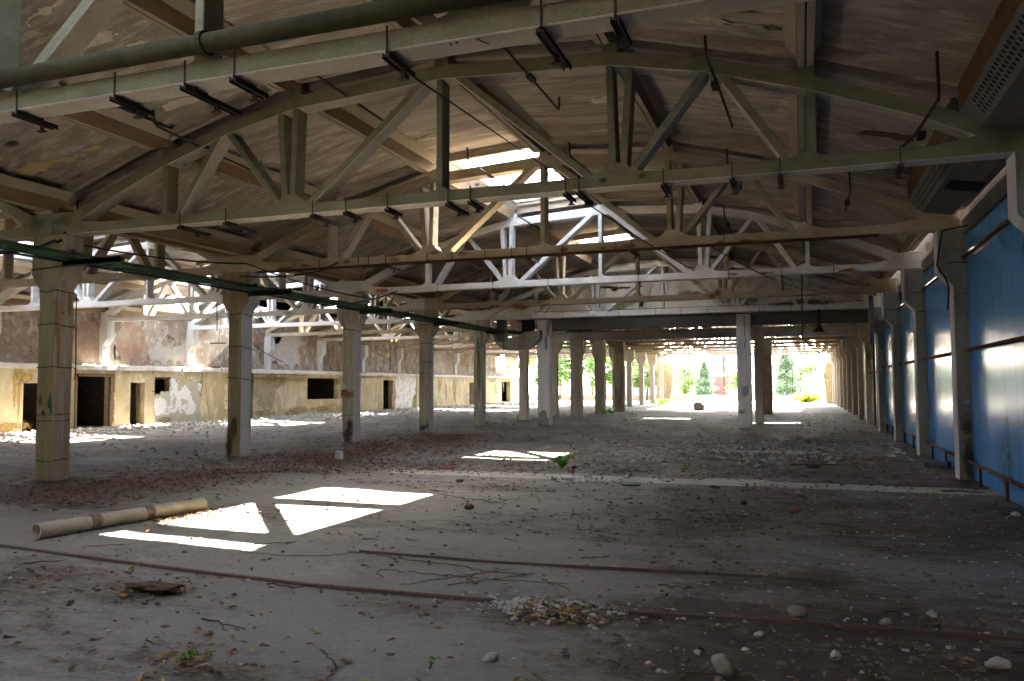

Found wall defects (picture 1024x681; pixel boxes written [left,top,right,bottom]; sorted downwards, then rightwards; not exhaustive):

leakage [0,371,31,432]
flaking render [115,322,209,423]
crack [229,549,569,585]